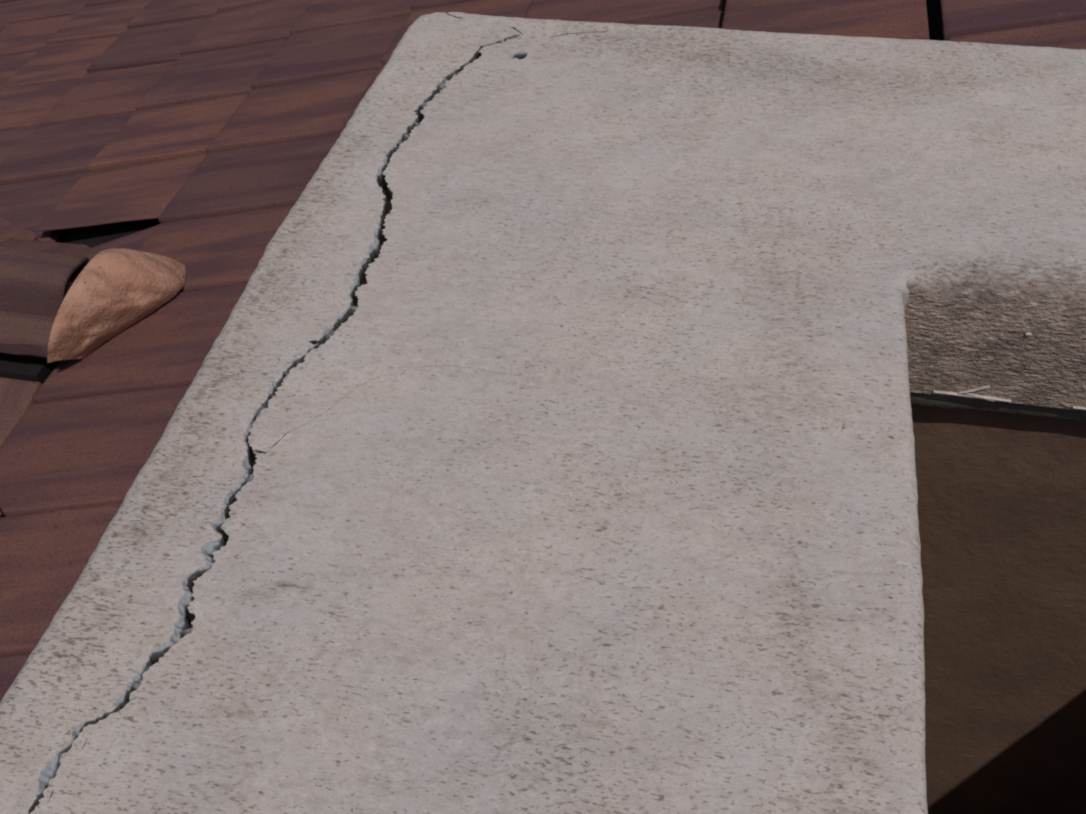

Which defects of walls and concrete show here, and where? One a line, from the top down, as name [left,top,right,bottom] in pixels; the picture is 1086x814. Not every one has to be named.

crack [27,27,522,814]
crack [550,30,608,38]